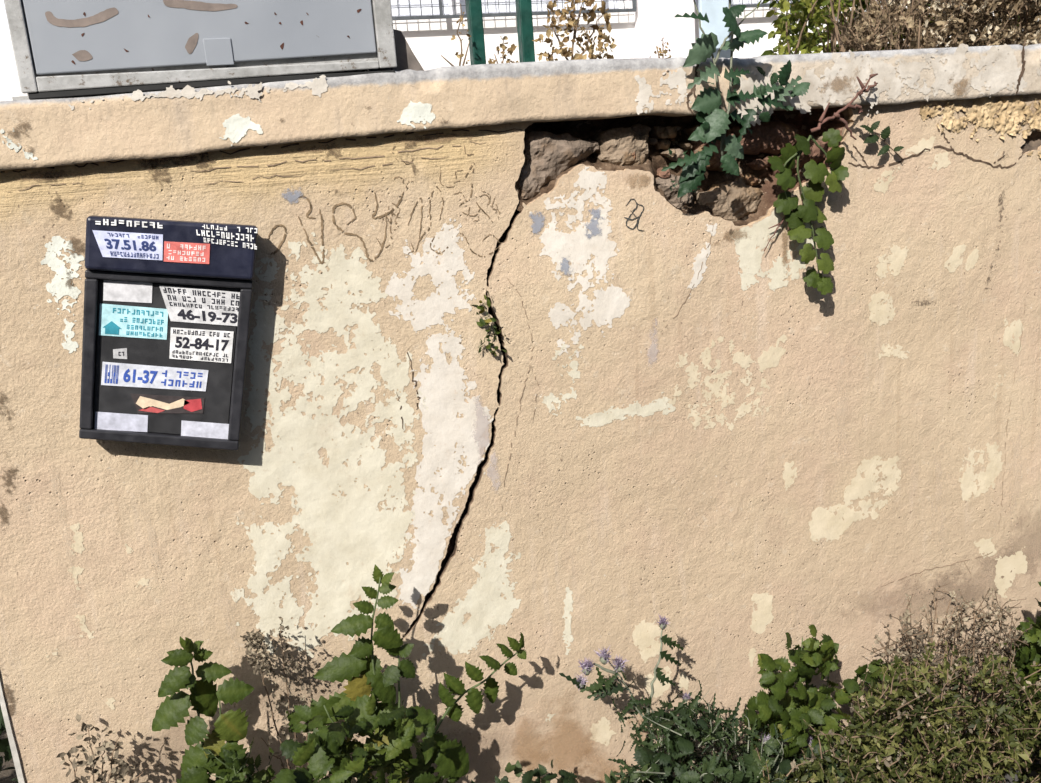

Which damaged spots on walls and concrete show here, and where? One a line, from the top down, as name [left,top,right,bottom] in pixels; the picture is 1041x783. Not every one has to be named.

peeling [121,81,270,102]
peeling [219,113,263,146]
peeling [283,75,328,97]
crack [848,132,1024,169]
crack [1016,44,1026,94]
peeling [515,43,1041,416]
peeling [41,236,84,353]
peeling [230,218,493,658]
crack [393,203,539,659]
peeling [575,334,787,433]
peeling [808,455,901,542]
peeling [422,521,521,659]